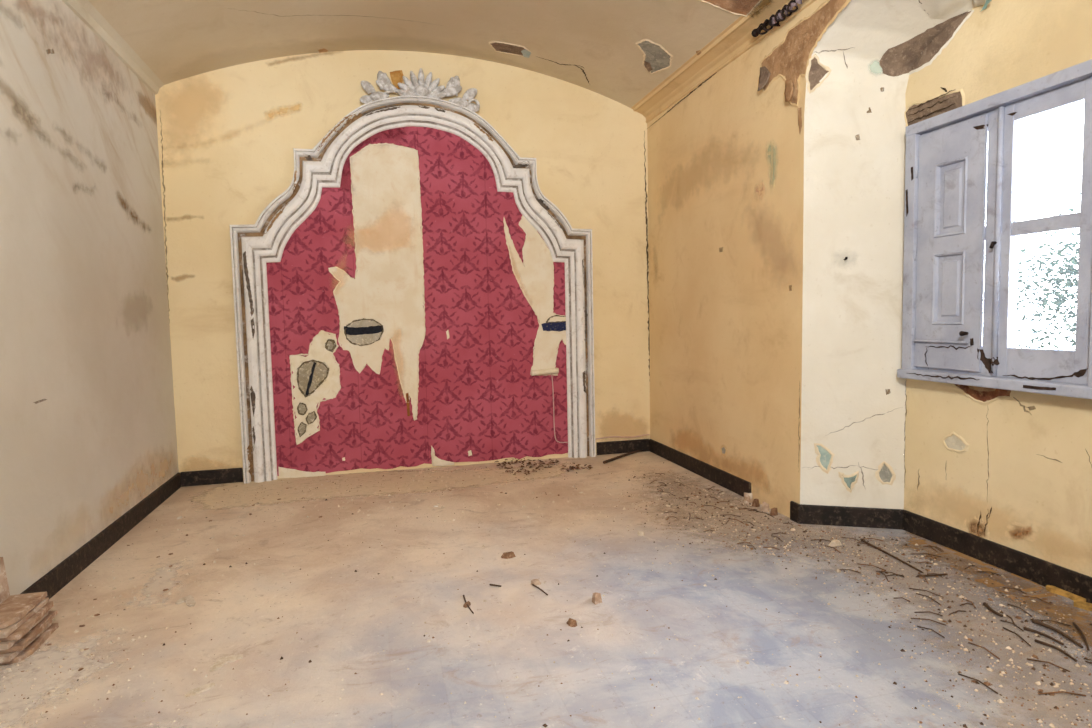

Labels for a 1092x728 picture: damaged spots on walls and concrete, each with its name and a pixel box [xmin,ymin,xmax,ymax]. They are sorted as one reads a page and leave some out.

flaking render [699,0,762,17]
flaking render [489,41,532,58]
flaking render [636,39,673,74]
flaking render [757,0,851,133]
flaking render [879,0,991,92]
peeling [970,338,1000,374]
flaking render [952,384,1056,406]
spalling [814,443,859,493]
spalling [875,461,896,485]